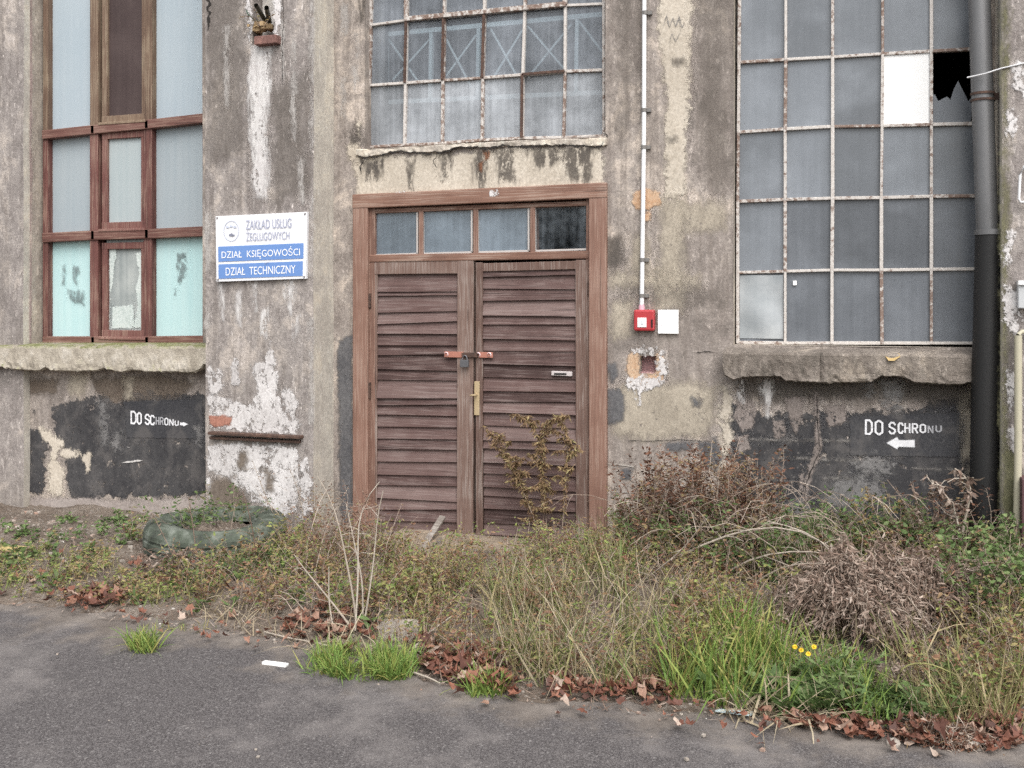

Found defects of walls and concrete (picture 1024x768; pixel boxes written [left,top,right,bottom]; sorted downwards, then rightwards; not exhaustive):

rust [520,69,565,138]
damp [361,158,384,179]
damp [475,146,516,188]
damp [527,147,592,183]
flaking render [609,0,725,310]
flaking render [611,302,632,339]
peeling [30,340,314,520]
peeling [607,351,971,541]